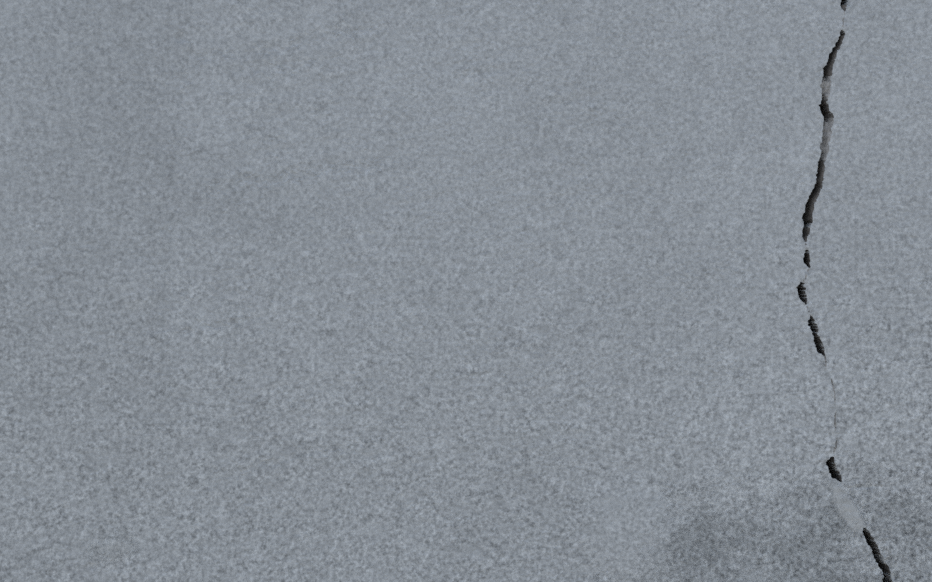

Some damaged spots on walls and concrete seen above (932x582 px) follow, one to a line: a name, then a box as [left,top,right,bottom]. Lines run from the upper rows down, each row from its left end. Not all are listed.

crack [796,0,892,582]